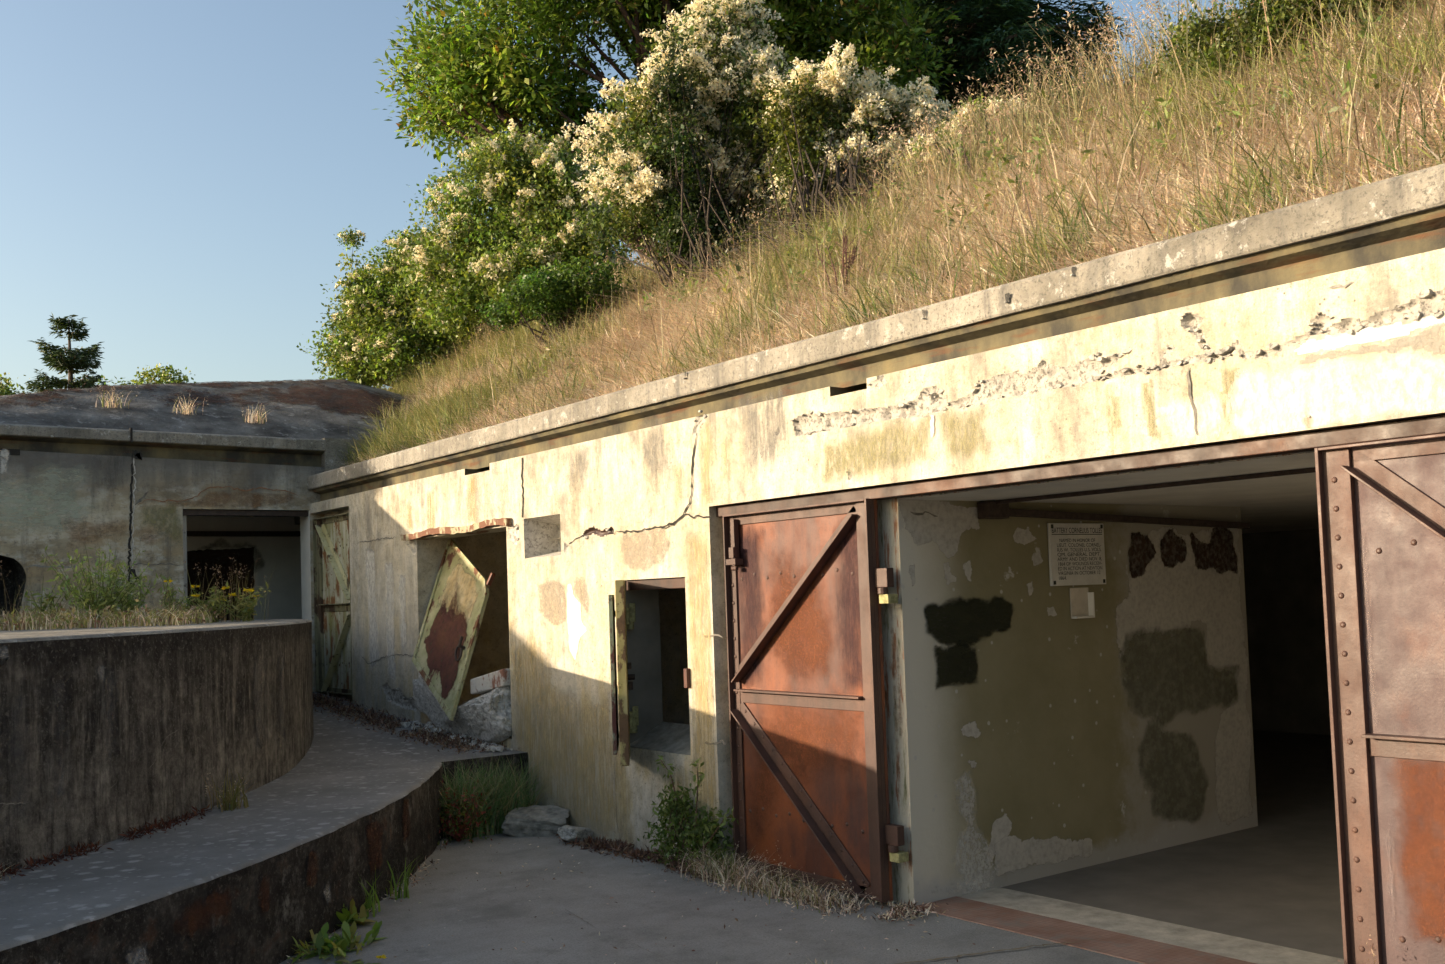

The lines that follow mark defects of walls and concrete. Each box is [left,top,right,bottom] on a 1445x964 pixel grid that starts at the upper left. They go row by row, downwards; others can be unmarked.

spalling [775,347,1133,437]
peeling [1160,287,1445,440]
crack [569,435,711,544]
rust [424,592,467,699]
peeling [1115,526,1253,824]
rust [761,711,860,771]
peeling [986,813,1093,876]